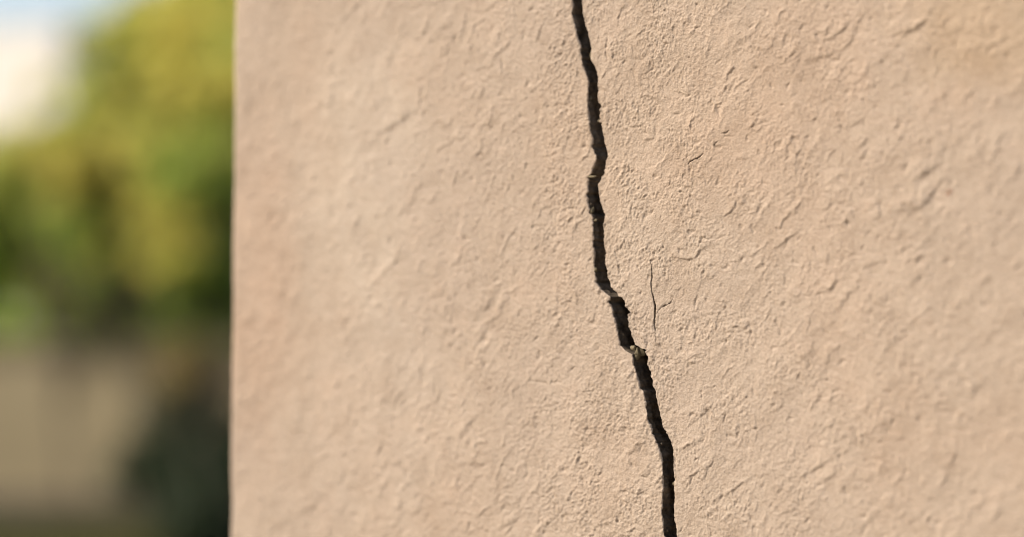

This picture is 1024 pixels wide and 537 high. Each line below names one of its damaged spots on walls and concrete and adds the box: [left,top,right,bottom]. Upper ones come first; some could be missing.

crack [572,0,677,537]